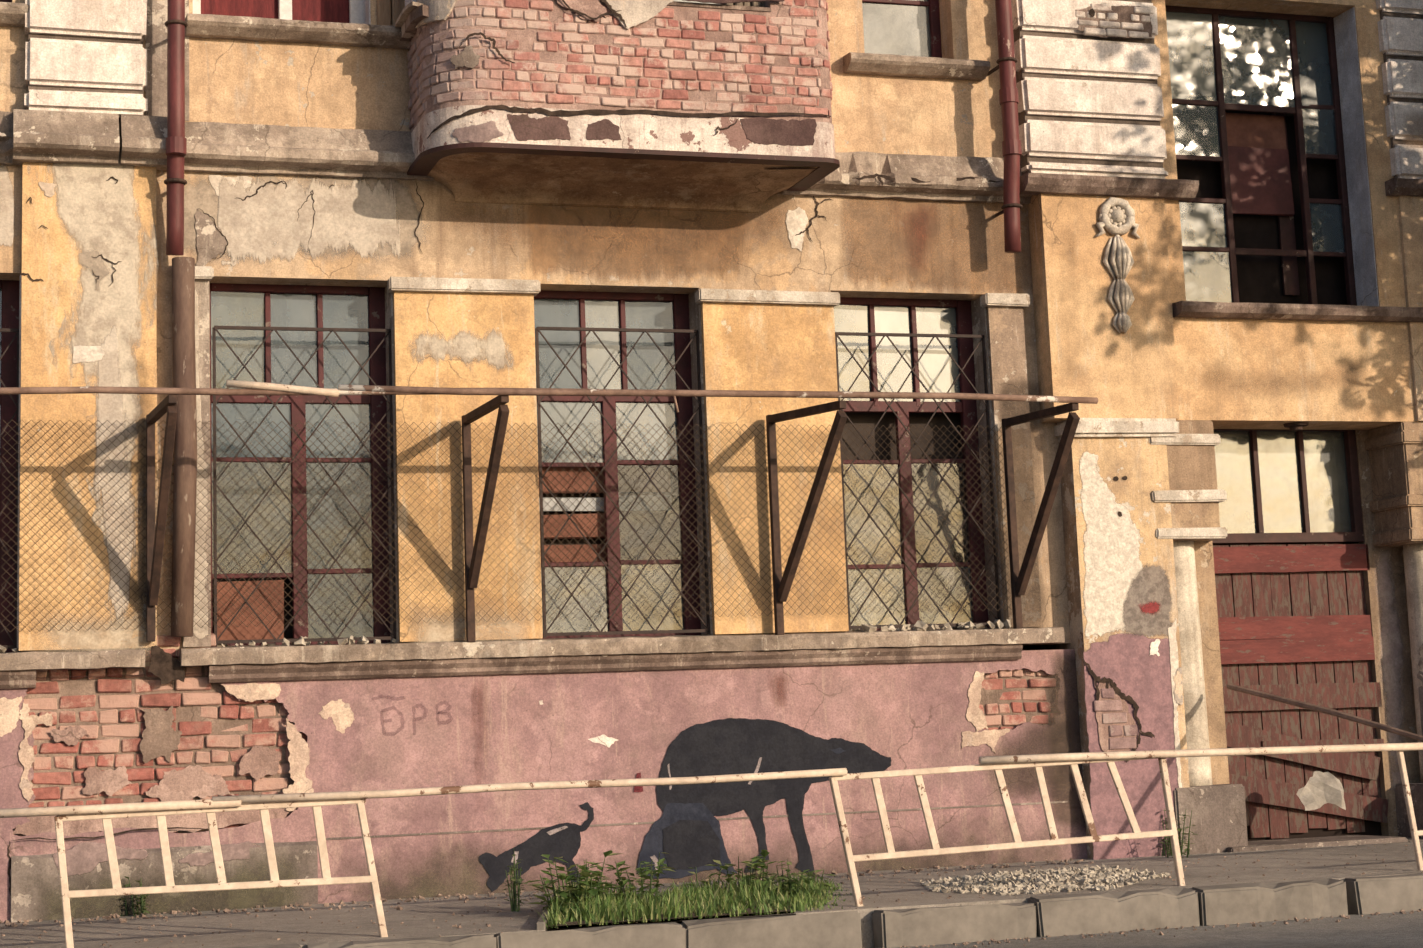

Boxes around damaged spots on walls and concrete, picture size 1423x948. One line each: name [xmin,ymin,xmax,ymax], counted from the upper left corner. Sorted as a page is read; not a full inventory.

flaking render [1075,3,1154,38]
peeling [452,114,622,142]
peeling [740,117,817,146]
peeling [184,174,423,266]
crack [767,168,1000,242]
peeling [412,329,513,370]
peeling [28,152,159,626]
flaking render [0,289,314,876]
peeling [1079,451,1183,860]
peeling [318,699,355,733]
flaking render [961,669,1056,754]